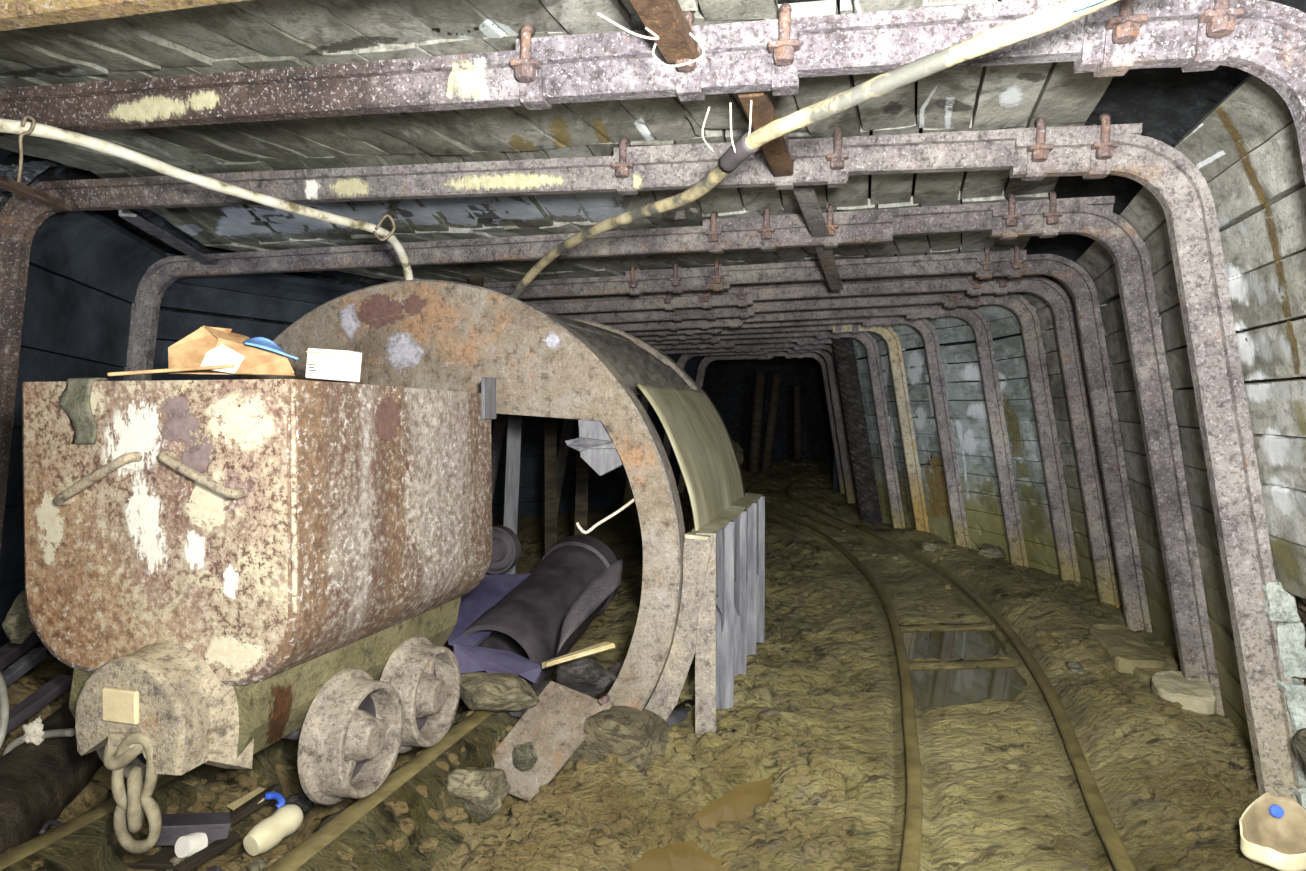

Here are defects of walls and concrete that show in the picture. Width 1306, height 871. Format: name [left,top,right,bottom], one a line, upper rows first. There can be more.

damp [1196,150,1225,169]
damp [1225,264,1283,307]
damp [1234,322,1306,517]
damp [1271,539,1299,577]